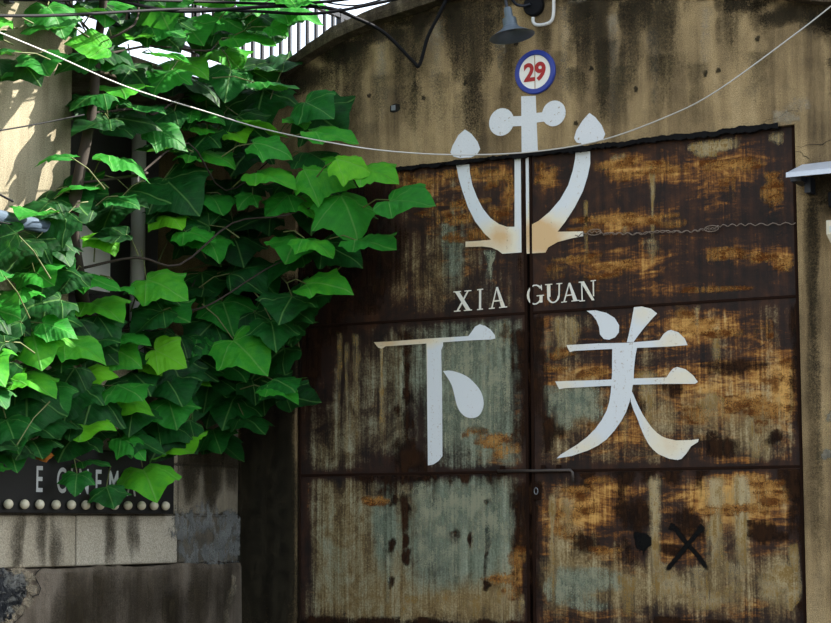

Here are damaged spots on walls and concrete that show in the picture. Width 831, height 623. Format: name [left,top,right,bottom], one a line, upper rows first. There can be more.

water stain [281,0,525,125]
water stain [563,0,677,100]
water stain [716,0,831,39]
corrosion [470,167,524,224]
corrosion [298,169,458,389]
water stain [804,173,831,423]
corrosion [662,304,802,458]
spalling [0,567,30,623]
water stain [180,404,301,623]
corrosion [357,332,437,565]
corrosion [482,471,683,601]
corrosion [670,469,802,562]